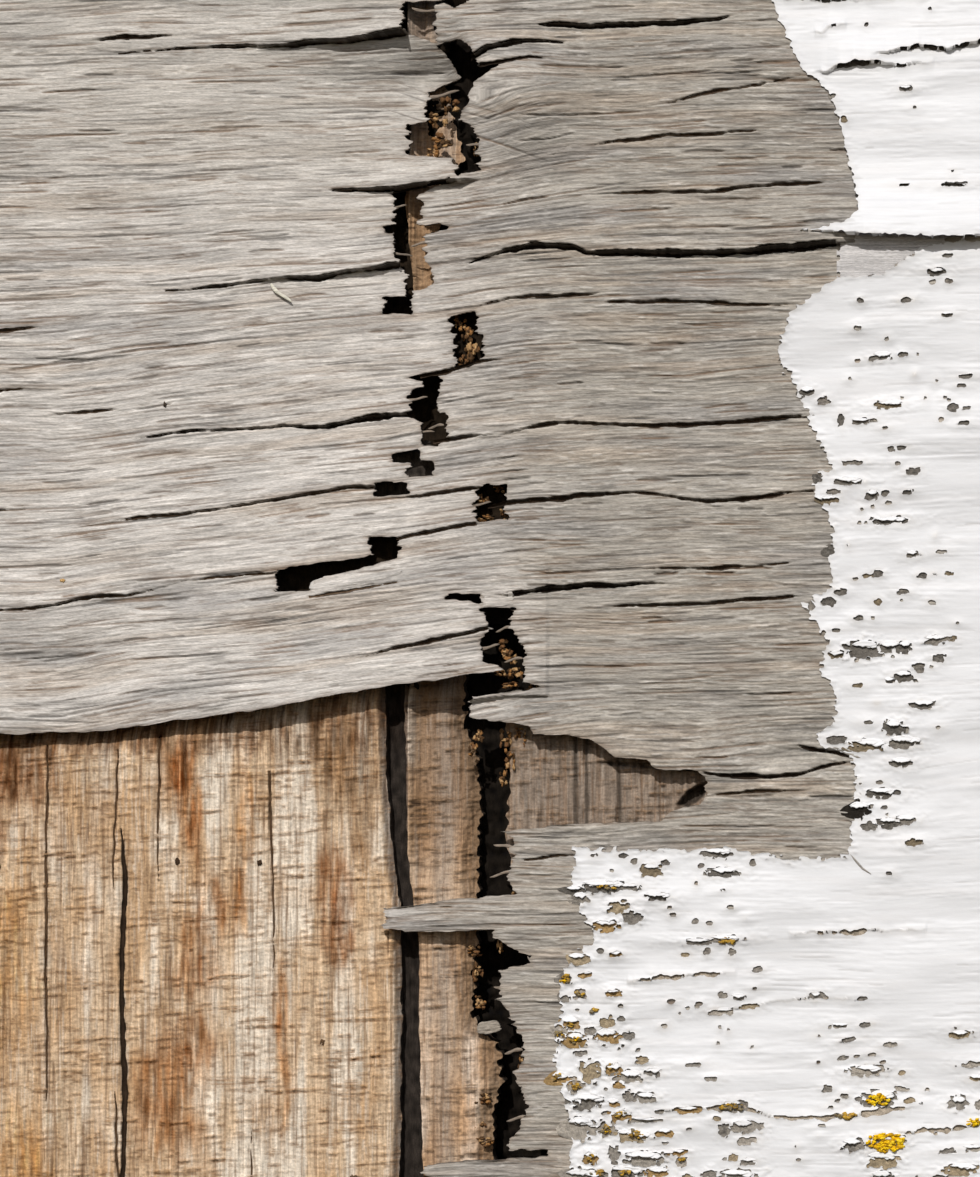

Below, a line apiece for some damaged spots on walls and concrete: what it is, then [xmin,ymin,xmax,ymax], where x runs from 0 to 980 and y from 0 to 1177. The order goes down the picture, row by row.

crack [102,0,729,315]
peeling [837,233,954,284]
crack [126,293,813,598]
crack [112,749,128,1177]
crack [386,682,424,1177]
crack [366,624,574,898]
crack [473,930,548,1158]
peeling [558,853,670,933]
peeling [543,948,839,1177]
peeling [840,780,923,847]
peeling [827,635,957,683]
peeling [841,1096,980,1177]